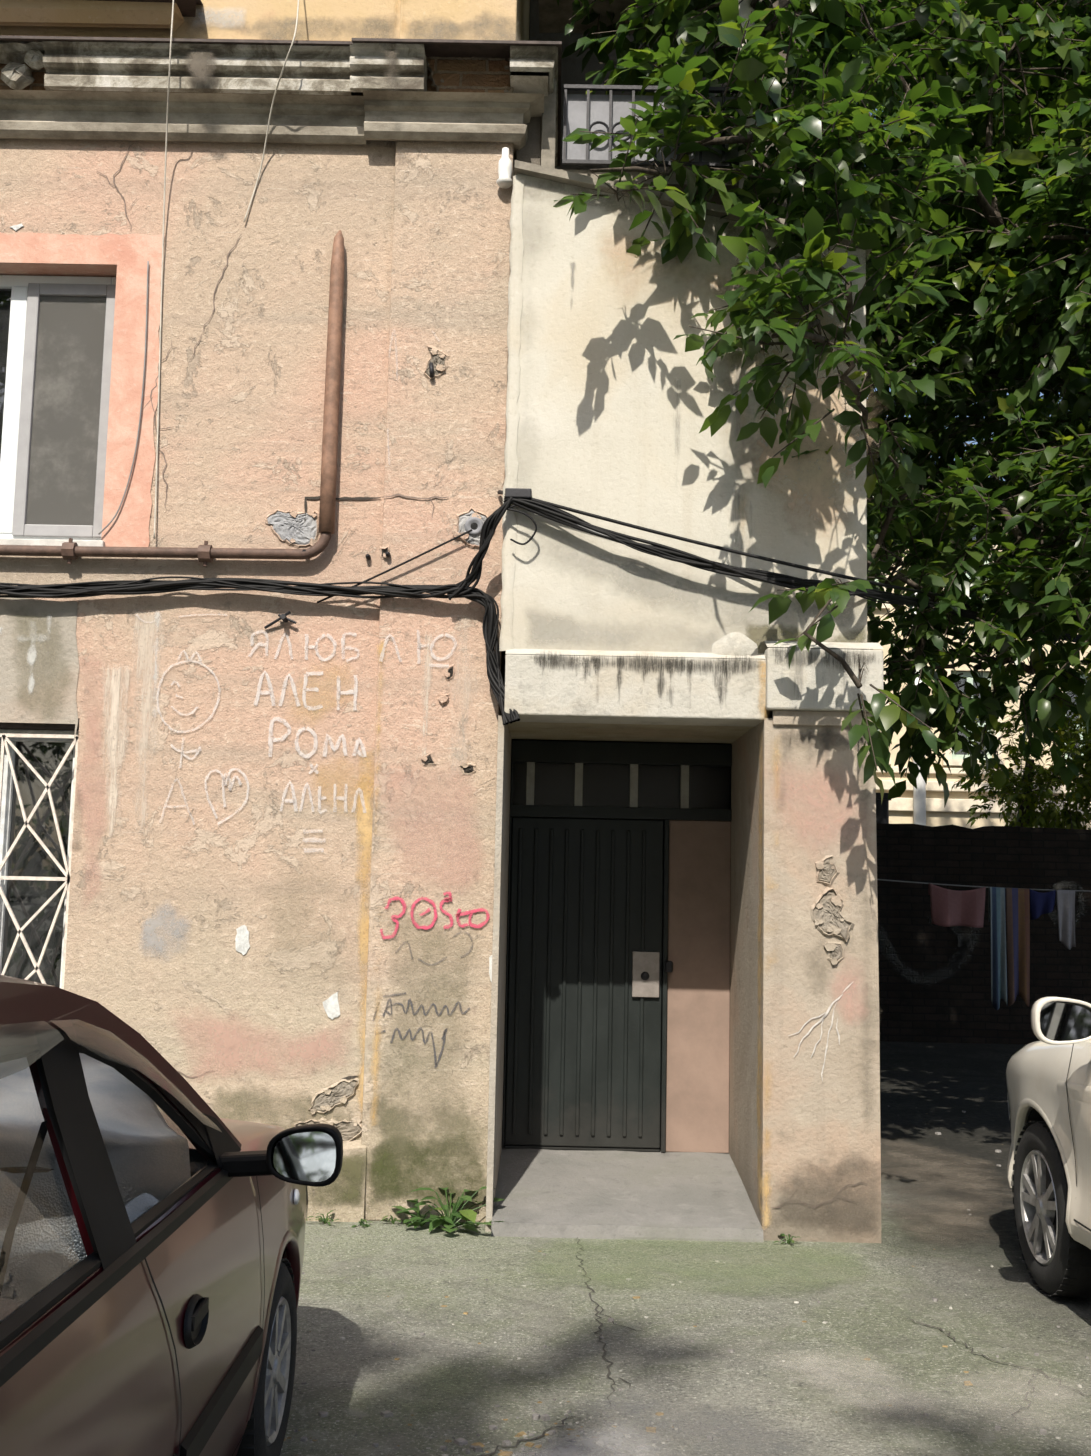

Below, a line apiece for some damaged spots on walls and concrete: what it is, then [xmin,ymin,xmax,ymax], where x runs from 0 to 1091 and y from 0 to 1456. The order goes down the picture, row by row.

water stain [531,616,751,699]
spalling [810,855,855,968]
flaking render [293,1078,362,1142]